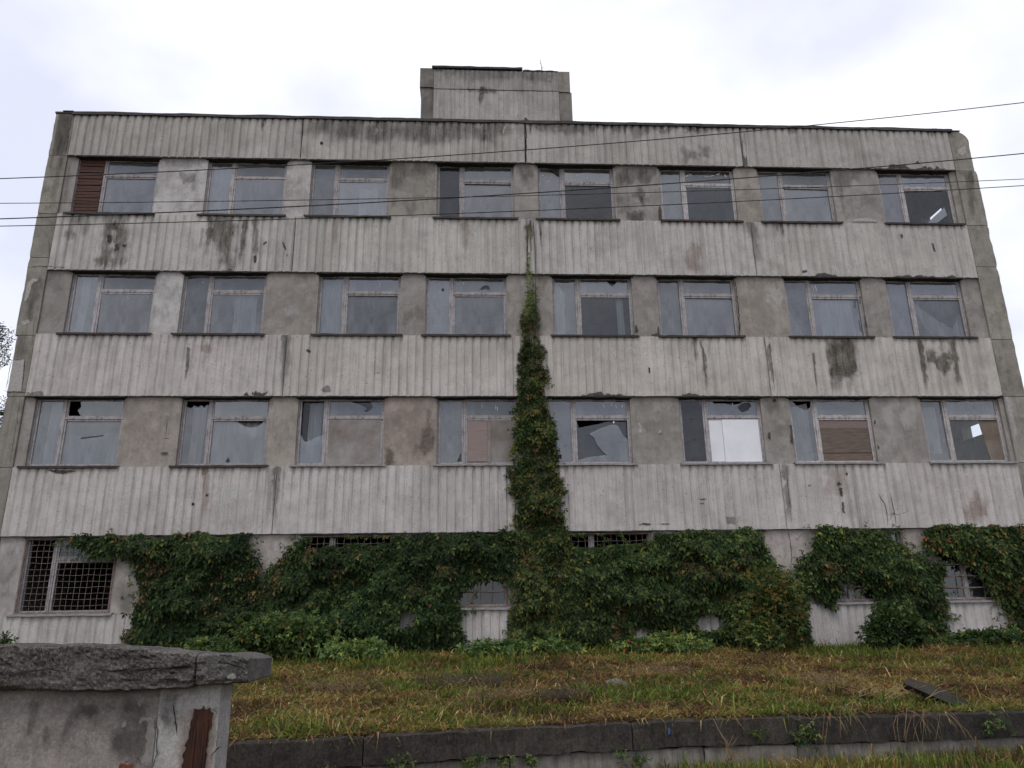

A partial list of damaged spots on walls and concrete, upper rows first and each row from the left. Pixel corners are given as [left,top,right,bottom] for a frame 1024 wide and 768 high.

damp [207,217,257,268]
damp [828,339,857,377]
damp [918,340,959,379]